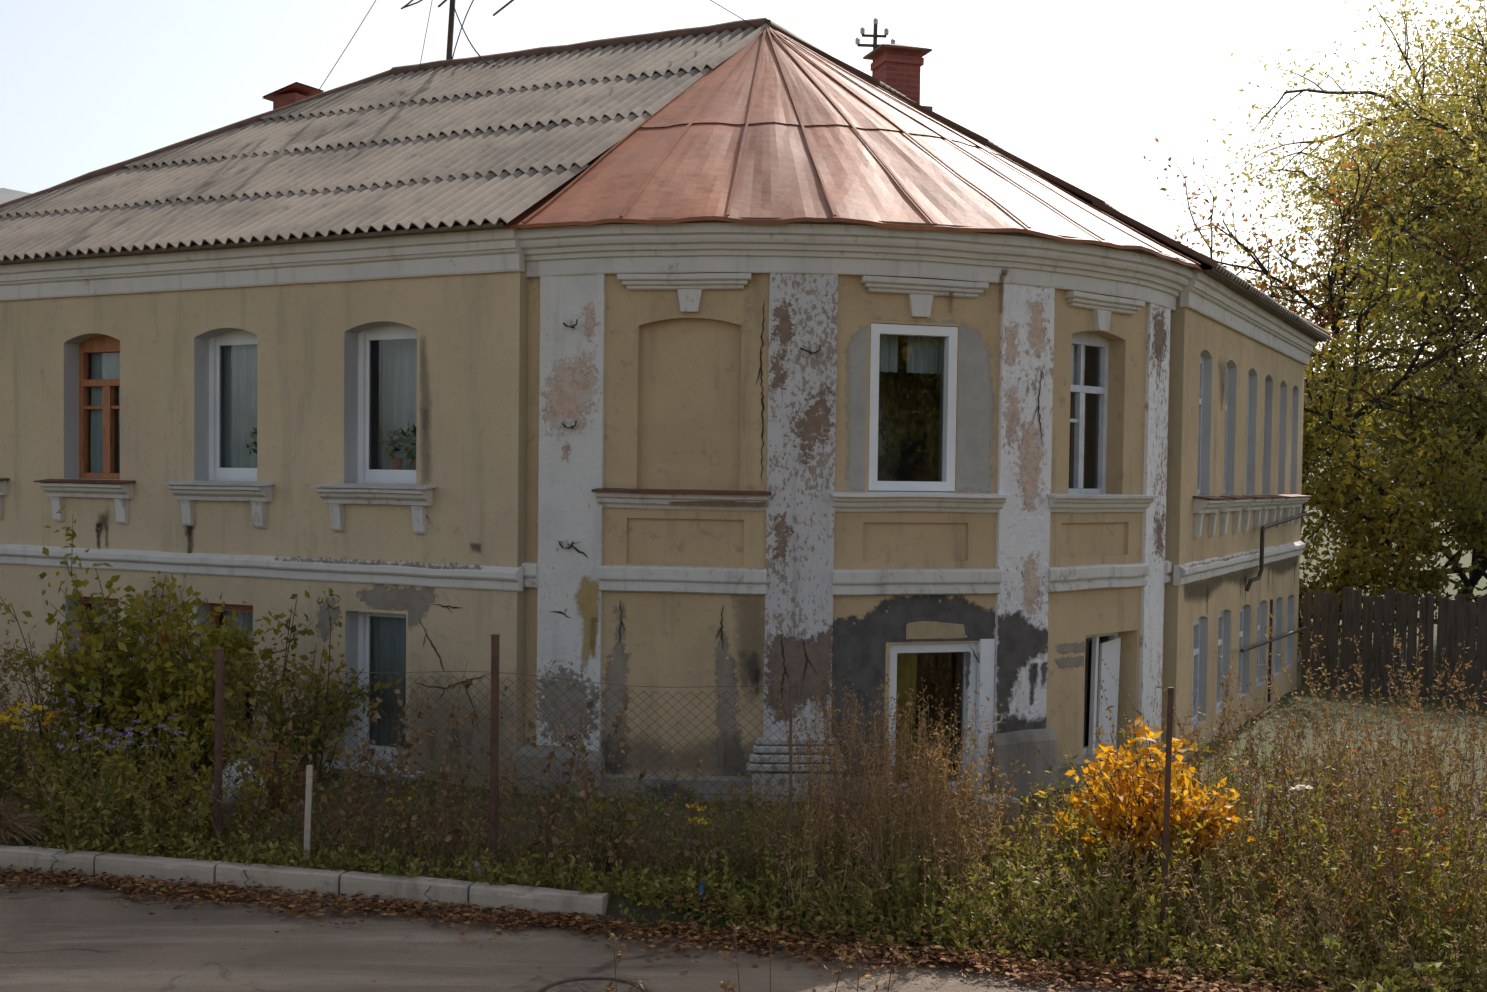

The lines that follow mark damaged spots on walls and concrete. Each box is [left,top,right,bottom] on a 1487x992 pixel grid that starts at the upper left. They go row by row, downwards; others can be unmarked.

peeling [1003,294,1050,366]
peeling [539,302,602,462]
peeling [768,301,837,470]
peeling [1002,384,1047,512]
peeling [274,556,481,570]
peeling [771,511,797,565]
flaking render [316,584,435,642]
flaking render [764,625,833,724]
flaking render [996,551,1048,734]